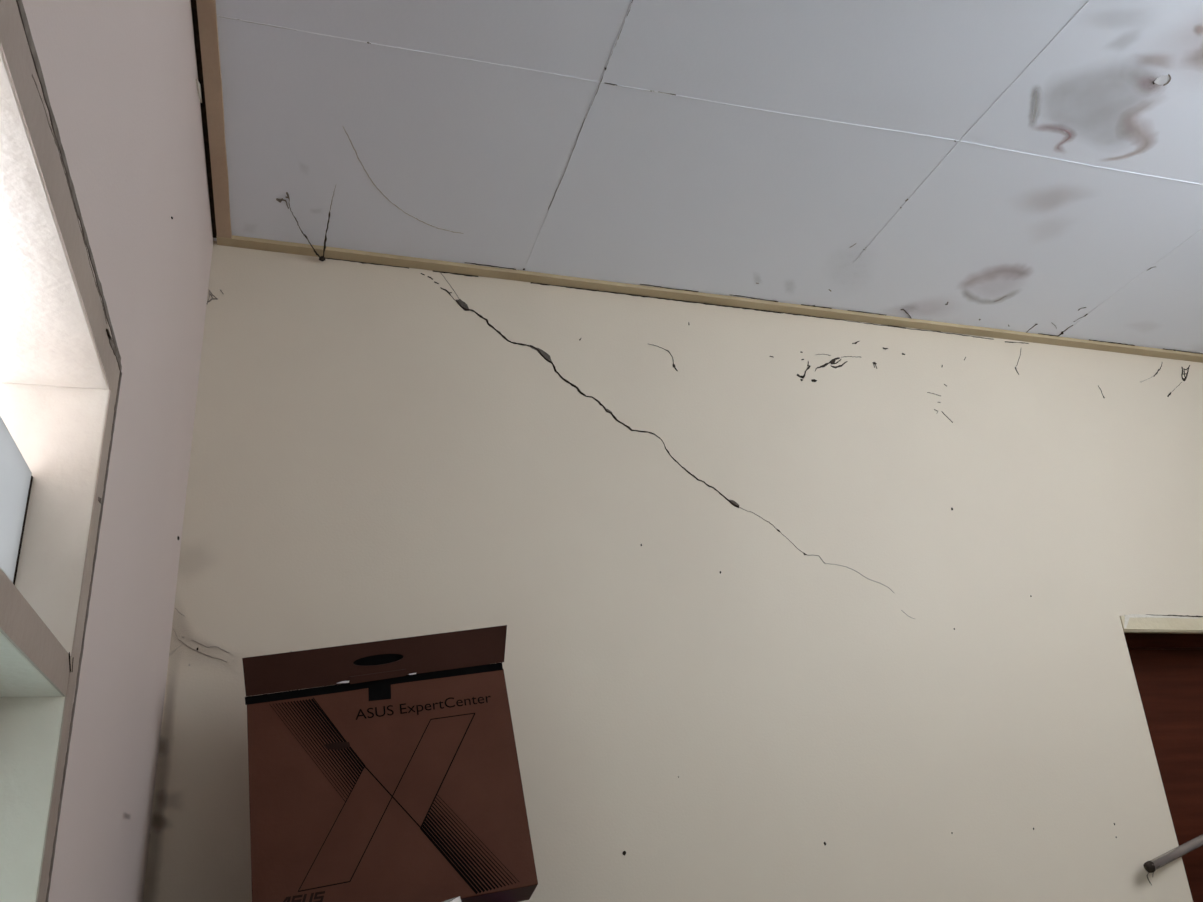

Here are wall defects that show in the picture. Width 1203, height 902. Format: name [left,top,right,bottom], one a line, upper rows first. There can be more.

crack [325,127,1203,619]